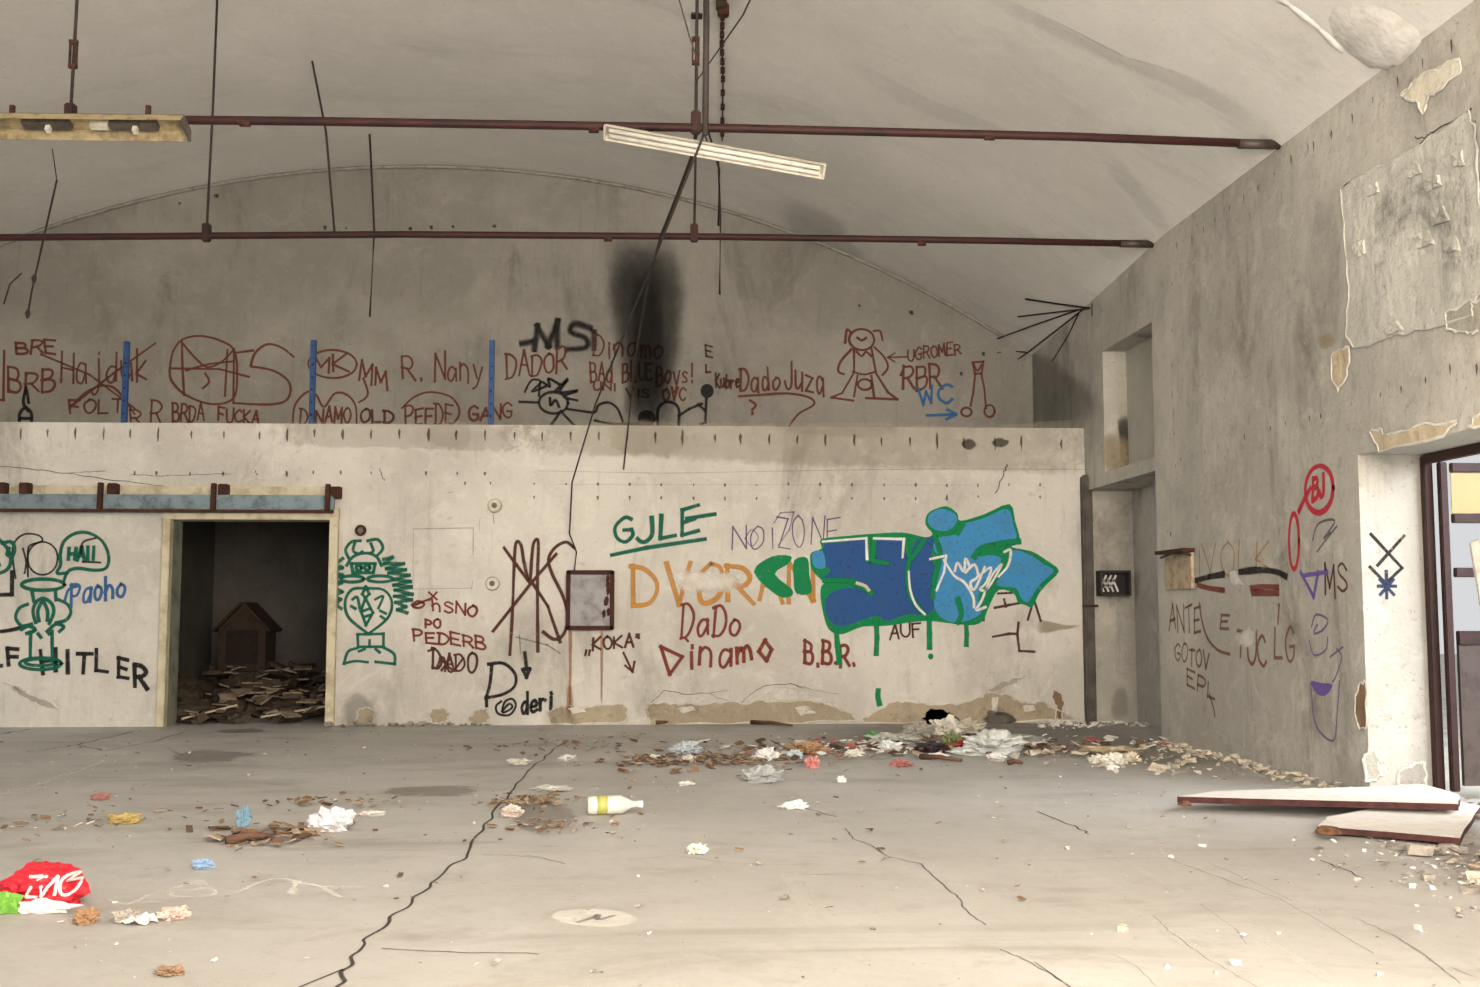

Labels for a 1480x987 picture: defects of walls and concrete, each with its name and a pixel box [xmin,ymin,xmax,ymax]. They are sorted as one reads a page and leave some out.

peeling [1400,58,1462,115]
peeling [1331,110,1480,393]
flaking render [1369,412,1480,453]
flaking render [546,675,1083,725]
crack [299,742,565,987]